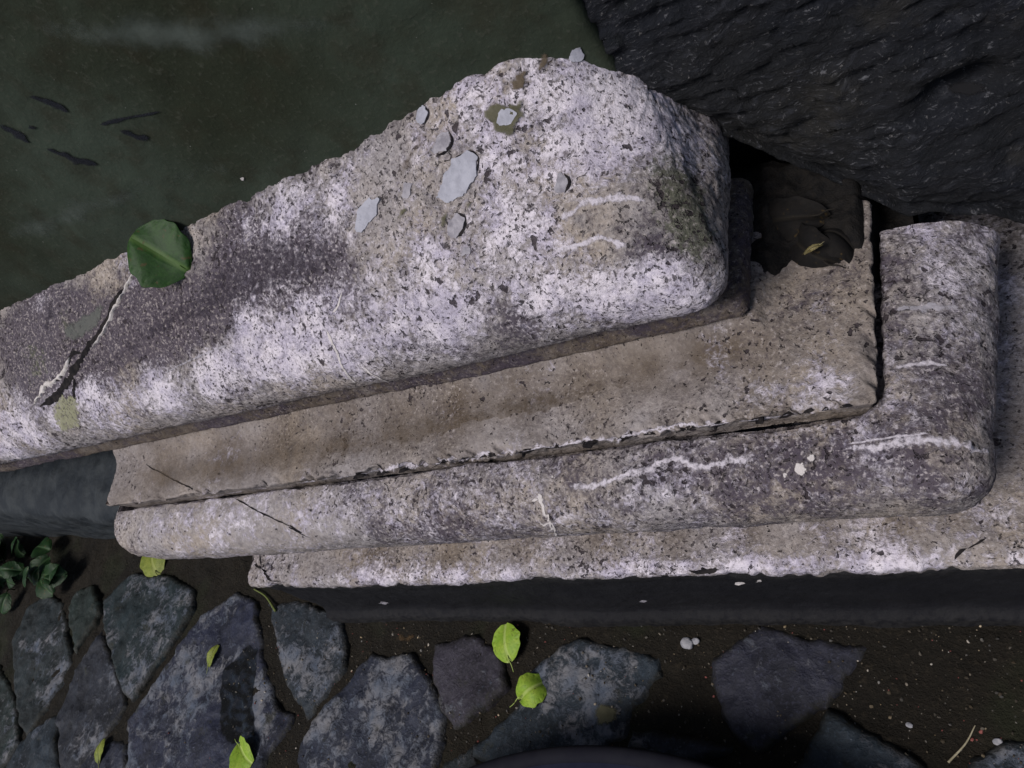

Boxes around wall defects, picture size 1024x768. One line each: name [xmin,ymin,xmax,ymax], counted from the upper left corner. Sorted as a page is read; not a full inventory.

spalling [512,71,526,90]
peeling [416,105,429,125]
peeling [496,108,517,126]
peeling [430,130,479,256]
peeling [554,172,571,193]
peeling [355,197,381,232]
crack [33,274,133,407]
leakage [846,432,997,458]
crack [146,464,193,490]
leakage [574,454,753,490]
crack [236,499,312,539]